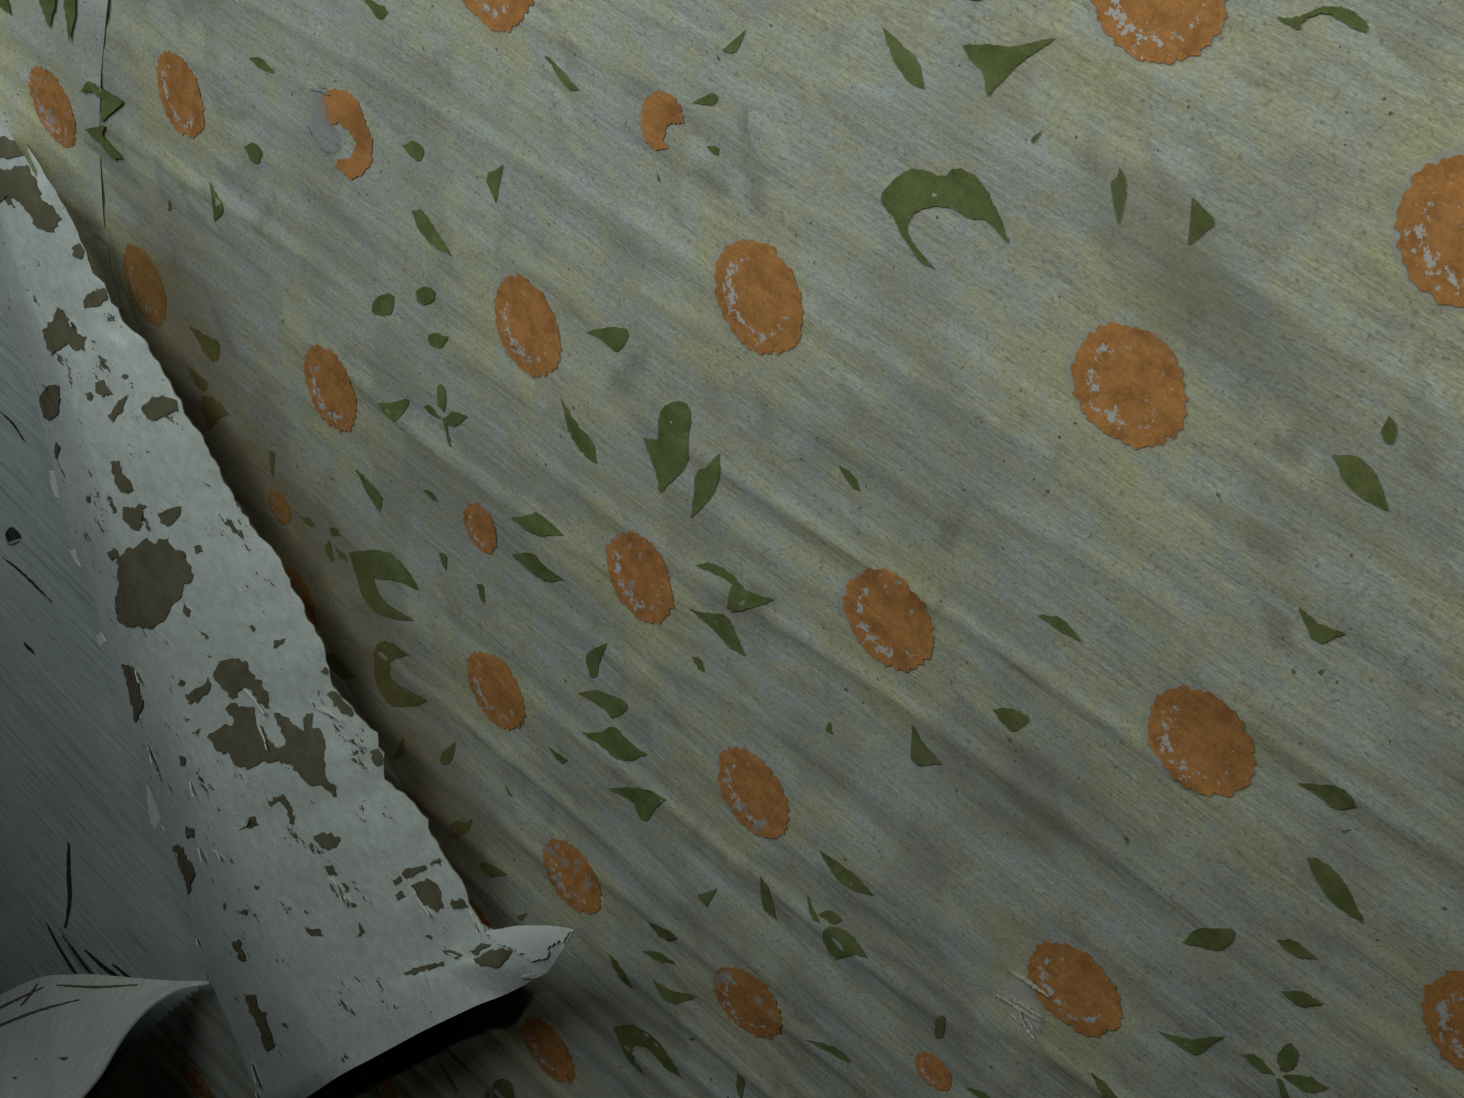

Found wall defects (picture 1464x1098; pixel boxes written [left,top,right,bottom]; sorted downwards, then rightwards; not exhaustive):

peeling [0,118,576,1098]